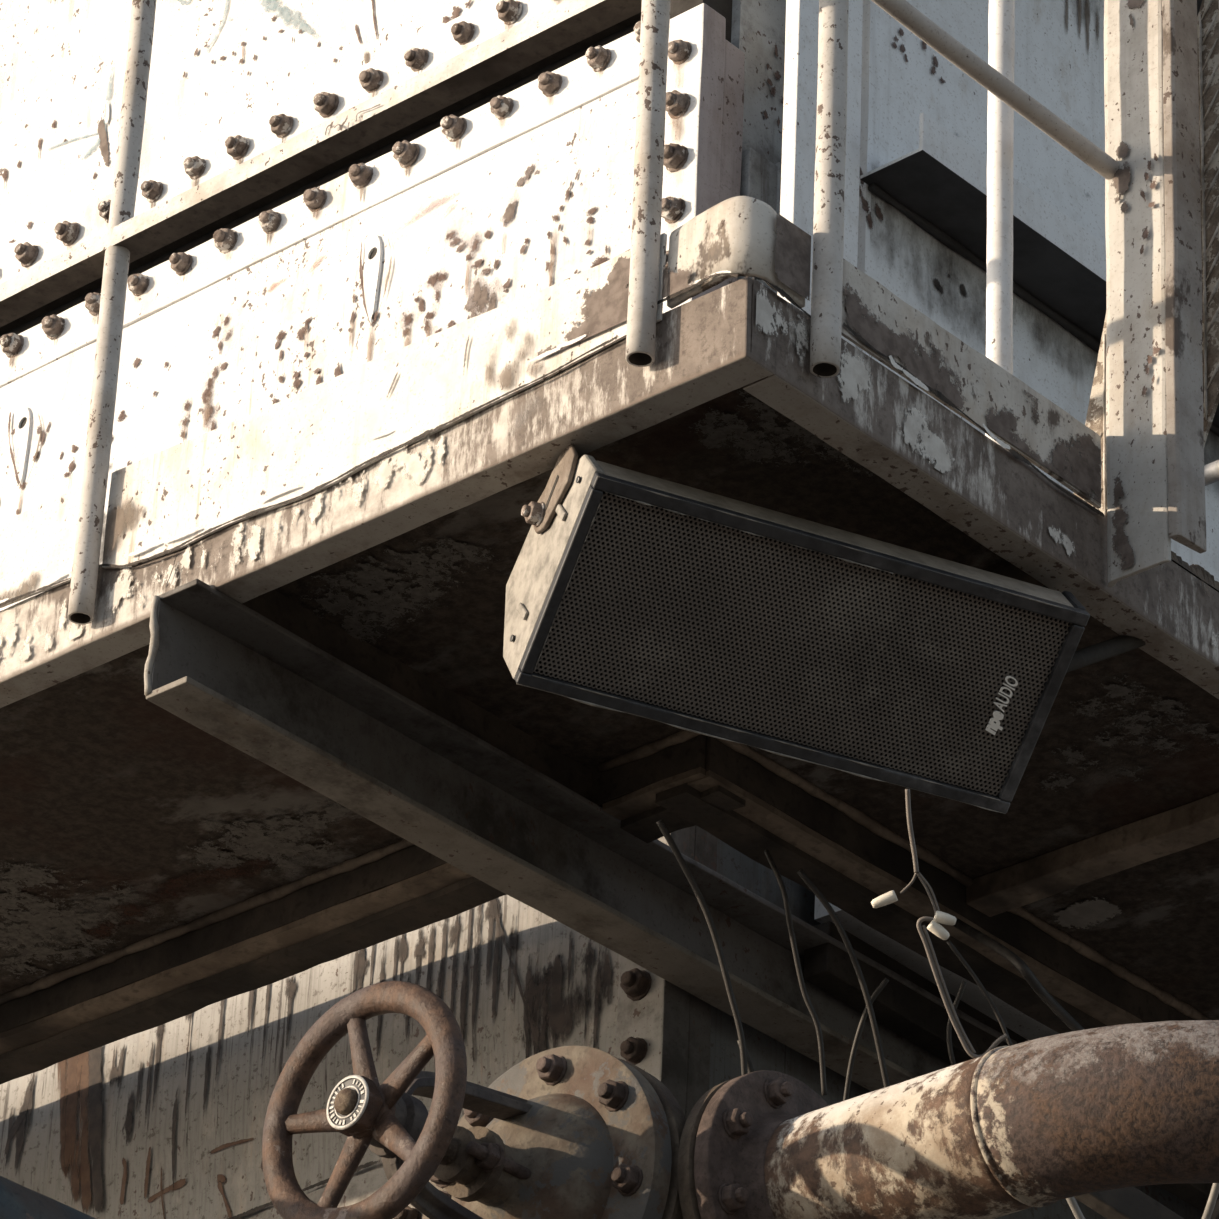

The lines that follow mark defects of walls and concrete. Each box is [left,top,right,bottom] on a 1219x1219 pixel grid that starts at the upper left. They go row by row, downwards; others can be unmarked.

rust [1110,141,1158,213]
rust [275,317,342,391]
rust [348,239,392,362]
peeling [538,256,630,358]
peeling [837,283,966,410]
peeling [107,434,445,613]
peeling [986,390,1134,570]
leakage [285,975,296,1047]
leakage [353,900,600,1062]
rust [57,1046,104,1214]
leakage [109,1025,165,1143]
leakage [172,1000,224,1192]